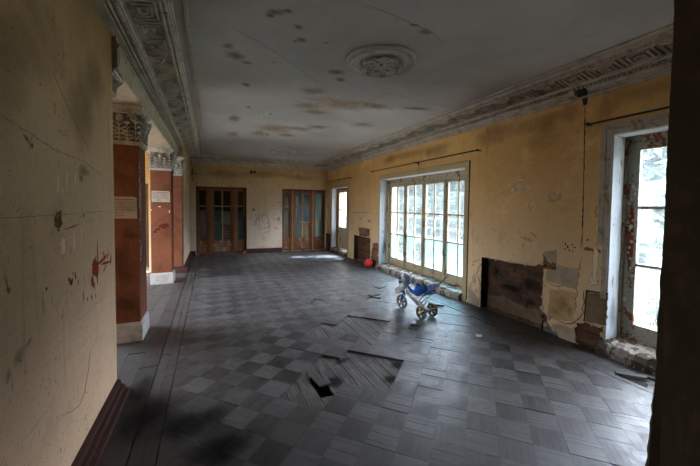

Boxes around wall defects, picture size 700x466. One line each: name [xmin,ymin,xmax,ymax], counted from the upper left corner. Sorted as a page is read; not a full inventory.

peeling [624,184,637,277]
flaking render [479,257,558,336]
flaking render [574,319,608,350]